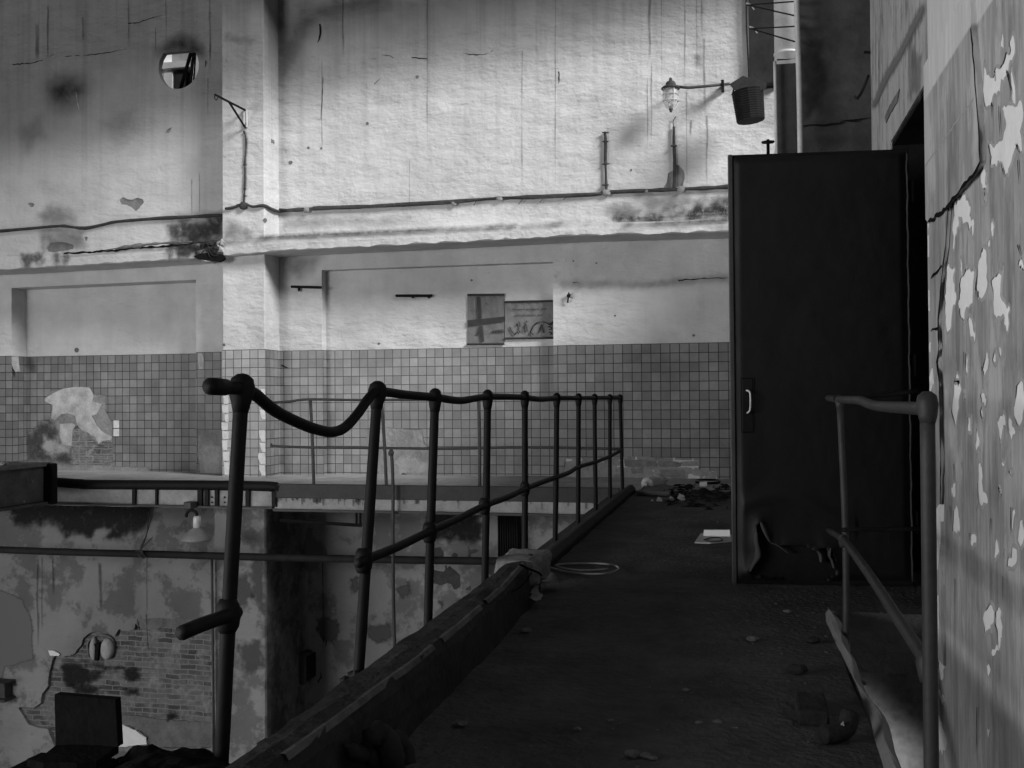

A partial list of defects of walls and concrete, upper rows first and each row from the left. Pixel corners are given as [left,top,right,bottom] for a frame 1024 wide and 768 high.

crack [998,69,1020,180]
flaking render [120,197,144,211]
water stain [170,217,223,256]
water stain [614,200,728,222]
peeling [944,29,1024,509]
crack [930,208,1011,530]
peeling [27,387,150,471]
water stain [10,505,153,539]
peeling [936,480,978,570]
flaking render [21,618,212,747]
peeling [938,661,947,754]
peeling [983,600,1004,676]